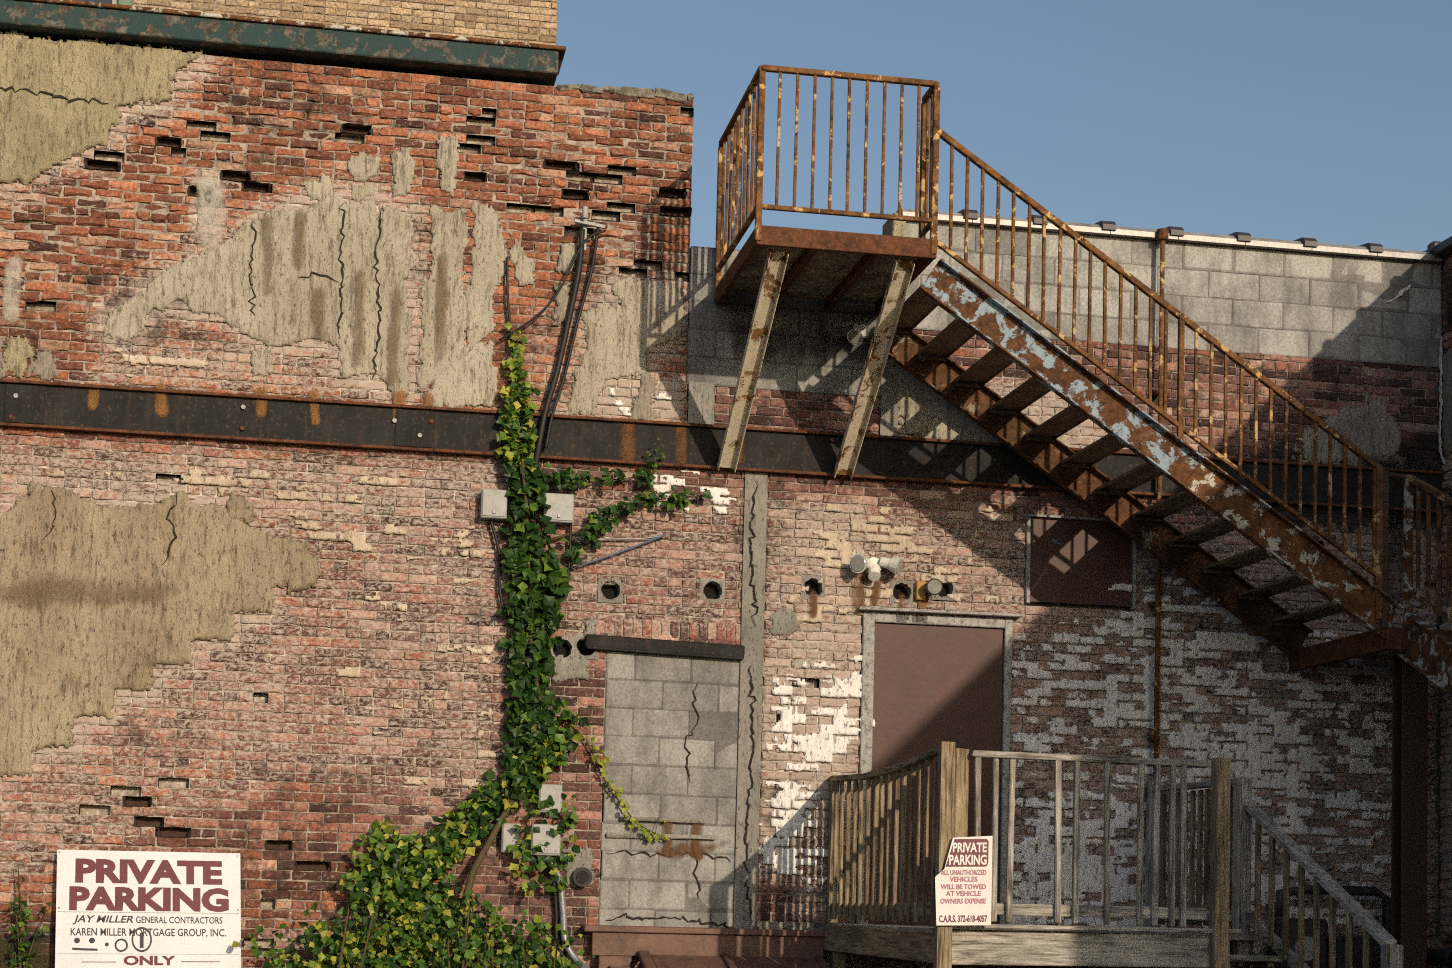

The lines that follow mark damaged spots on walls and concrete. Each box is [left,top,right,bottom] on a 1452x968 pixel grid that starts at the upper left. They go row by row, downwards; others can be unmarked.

crack [0,86,109,104]
peeling [0,30,203,185]
peeling [104,123,536,408]
corrosion [88,383,99,409]
corrosion [155,383,168,416]
corrosion [310,389,320,425]
crack [162,494,177,565]
peeling [0,466,407,777]
crack [749,480,759,626]
corrosion [853,573,881,611]
crack [606,667,757,928]
peeling [1007,570,1392,933]